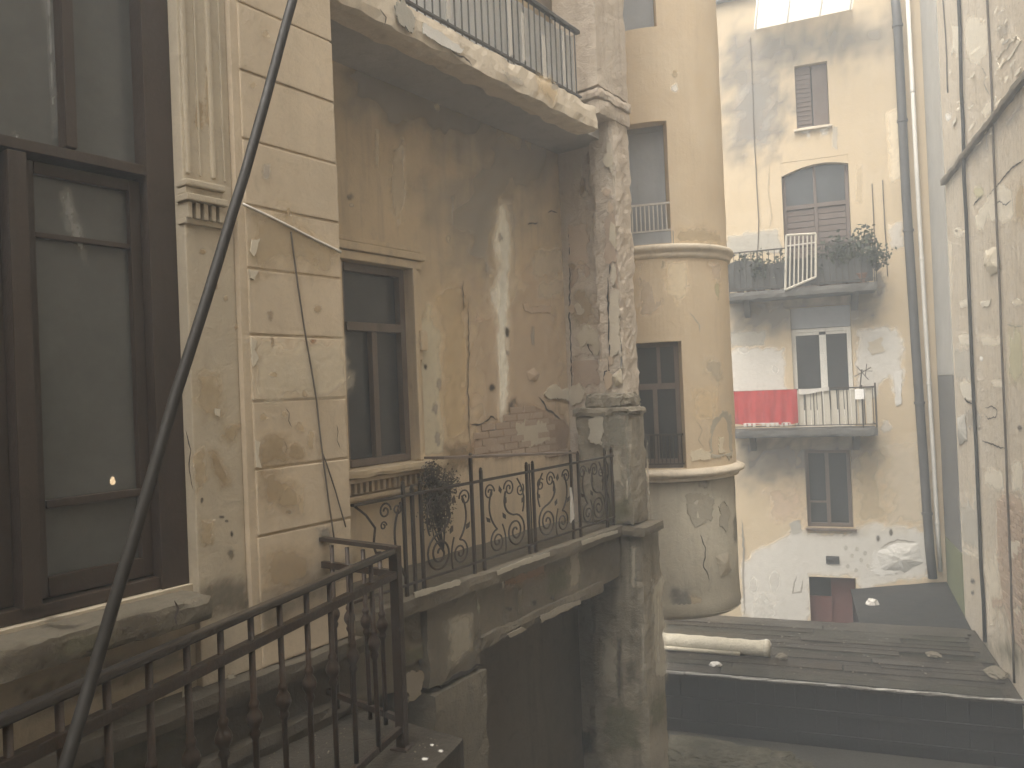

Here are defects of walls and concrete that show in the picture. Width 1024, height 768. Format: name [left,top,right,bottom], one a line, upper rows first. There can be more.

peeling [951,17,1021,81]
crack [974,160,1023,206]
peeling [544,264,622,406]
peeling [516,419,550,448]
peeling [588,416,604,445]
peeling [685,492,731,533]